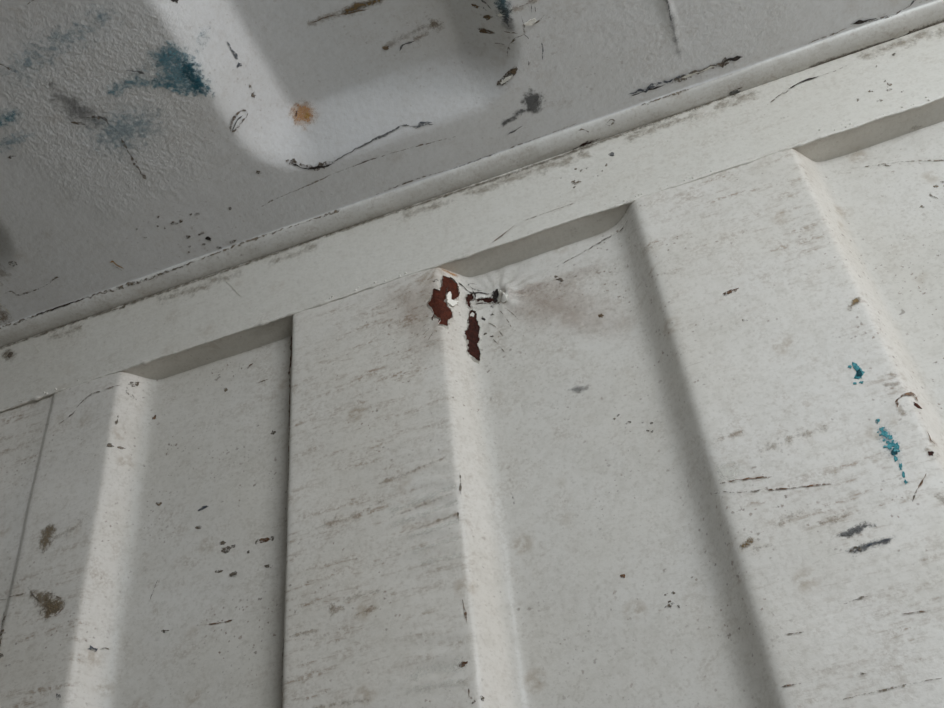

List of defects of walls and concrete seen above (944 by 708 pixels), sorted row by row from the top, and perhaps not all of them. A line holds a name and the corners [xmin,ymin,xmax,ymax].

peeling [31,590,64,618]